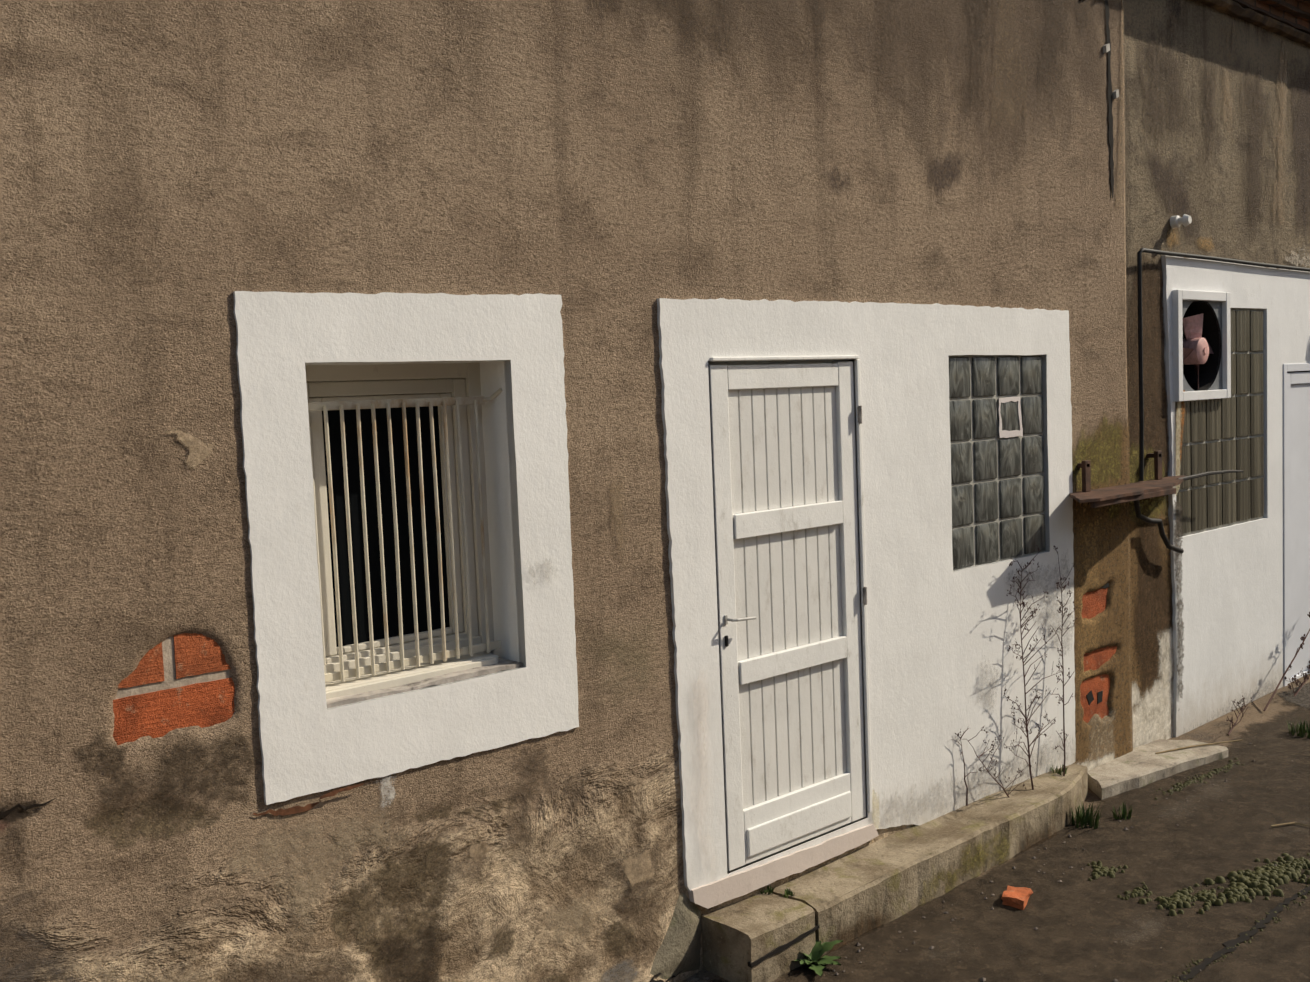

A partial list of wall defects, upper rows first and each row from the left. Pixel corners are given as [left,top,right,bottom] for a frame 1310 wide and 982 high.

flaking render [164,429,215,469]
water stain [1072,261,1173,765]
flaking render [1081,583,1109,619]
flaking render [1080,646,1117,723]
flaking render [78,633,255,847]
crack [0,798,56,828]
water stain [603,849,659,954]
water stain [489,930,515,954]
crack [650,970,683,982]